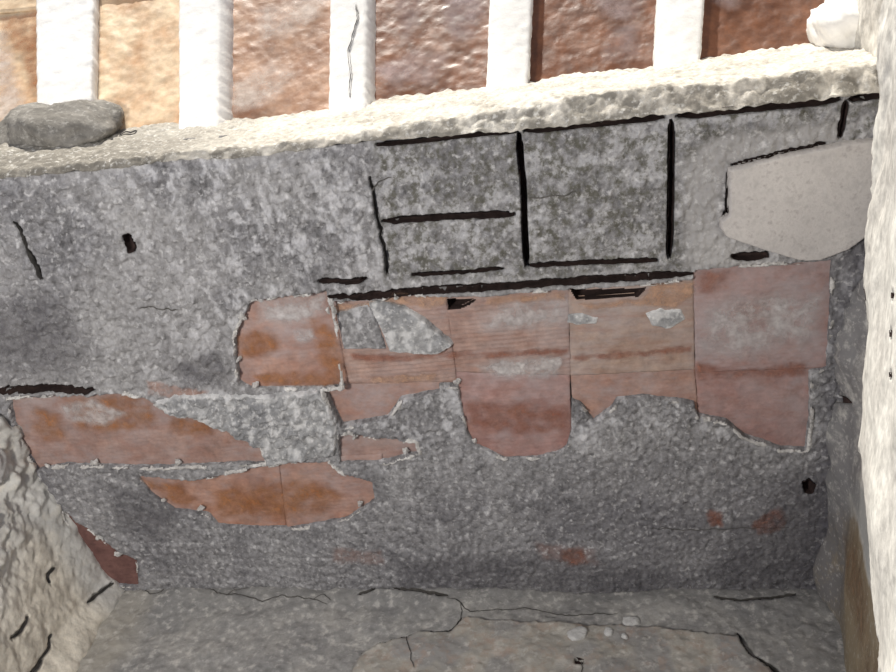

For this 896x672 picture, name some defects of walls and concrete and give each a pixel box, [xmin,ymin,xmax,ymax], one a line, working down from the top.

crack [369,176,391,274]
crack [13,221,43,280]
flaking render [325,297,344,339]
flaking render [6,395,53,414]
flaking render [320,364,345,409]
flaking render [777,407,815,453]
flaking render [45,448,283,480]
flaking render [382,438,422,466]
crack [87,583,114,603]
crack [10,616,28,639]
crack [359,587,617,666]
crack [30,634,52,672]